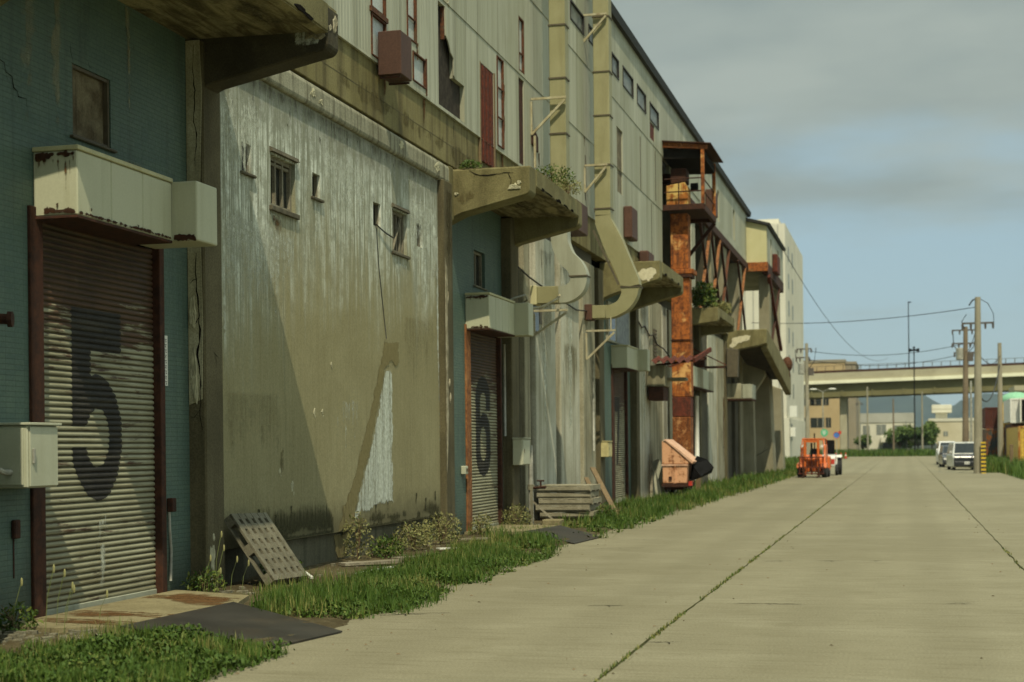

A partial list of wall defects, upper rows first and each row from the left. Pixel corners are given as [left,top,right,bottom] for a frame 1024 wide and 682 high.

crack [189,46,197,153]
rust [35,150,74,174]
rust [44,203,196,241]
peeling [638,267,679,285]
peeling [729,335,750,348]
peeling [339,342,399,532]
damp [271,491,440,558]